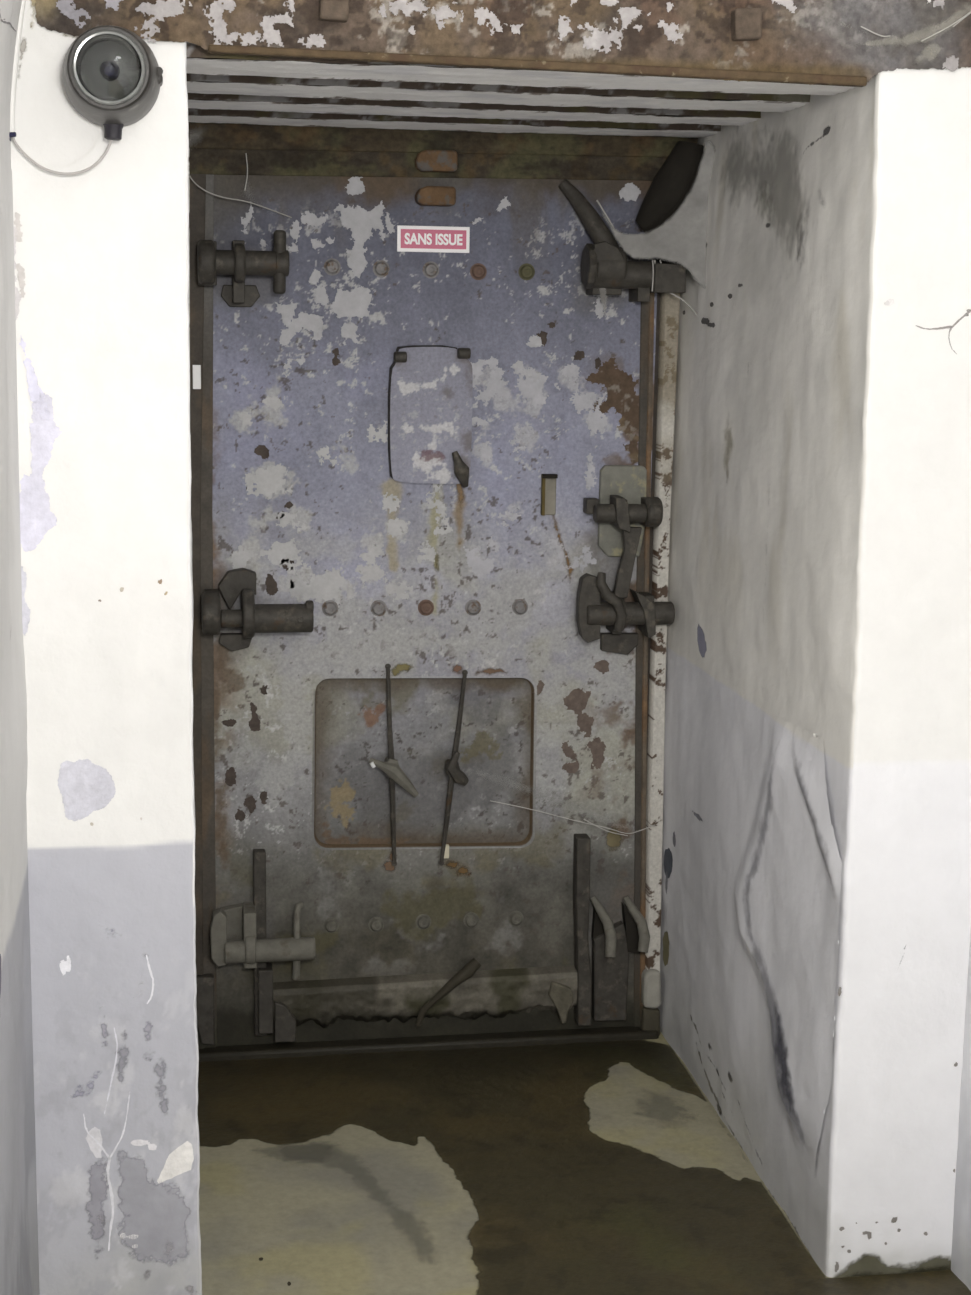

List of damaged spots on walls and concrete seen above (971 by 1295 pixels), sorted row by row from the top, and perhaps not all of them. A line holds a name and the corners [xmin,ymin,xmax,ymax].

peeling [56,0,91,28]
peeling [105,0,326,48]
peeling [378,0,523,36]
peeling [558,0,683,53]
peeling [771,0,797,13]
crack [917,309,971,354]
spalling [58,759,116,826]
peeling [59,955,71,975]
peeling [101,1024,129,1082]
leakage [775,1017,793,1104]
leakage [198,1040,971,1295]
peeling [86,1127,194,1274]